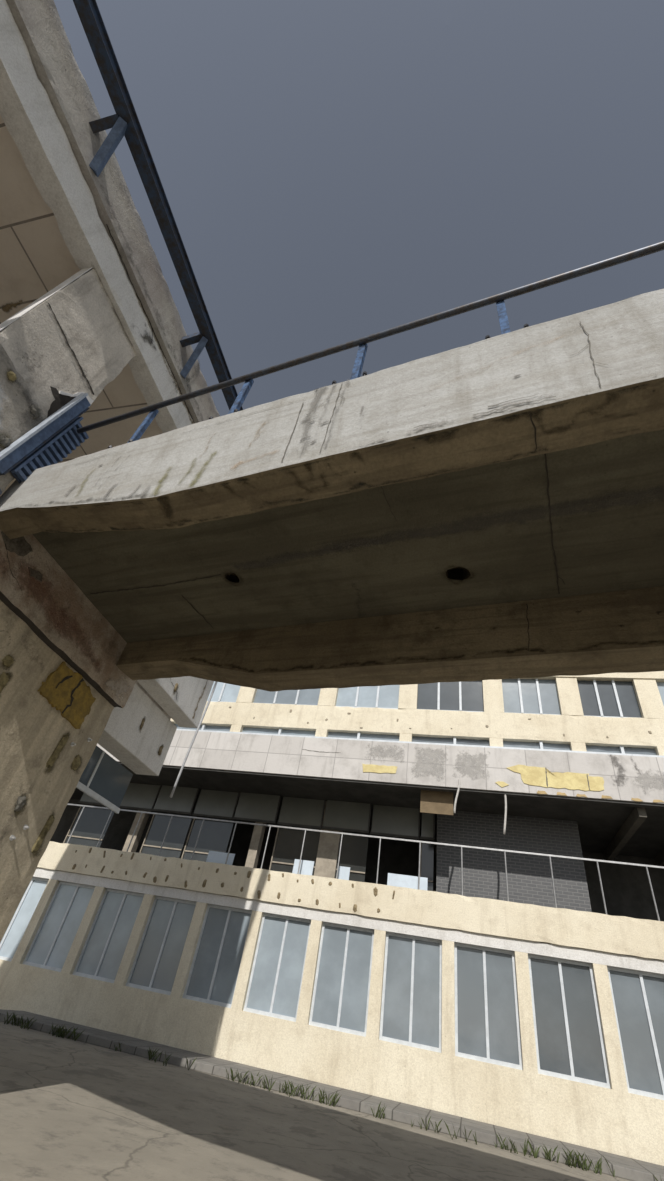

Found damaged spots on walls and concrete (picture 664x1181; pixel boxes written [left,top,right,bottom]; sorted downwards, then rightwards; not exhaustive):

crack [572,321,606,386]
water stain [286,383,349,490]
crack [530,413,565,594]
peeling [412,749,508,787]
peeling [631,773,664,803]